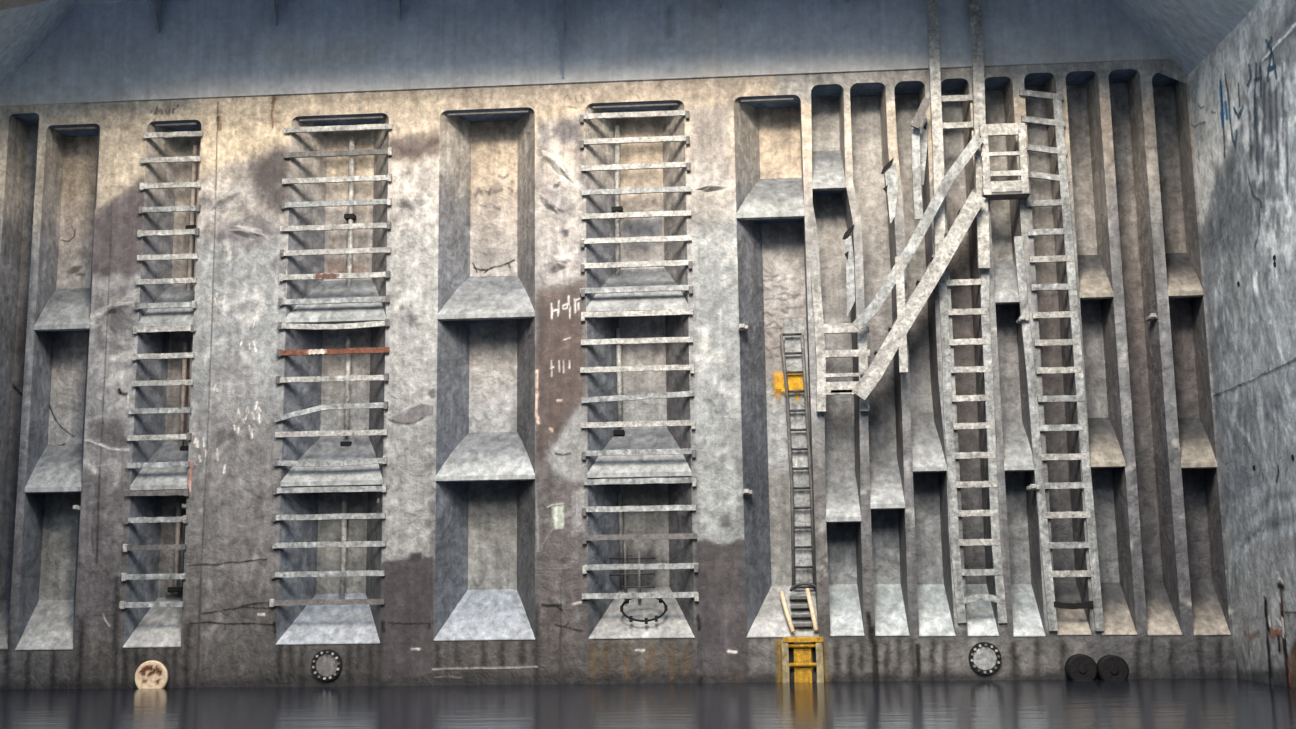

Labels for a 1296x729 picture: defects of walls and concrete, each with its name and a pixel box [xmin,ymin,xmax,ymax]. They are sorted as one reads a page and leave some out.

crack [1213,358,1296,396]
water stain [627,545,655,586]